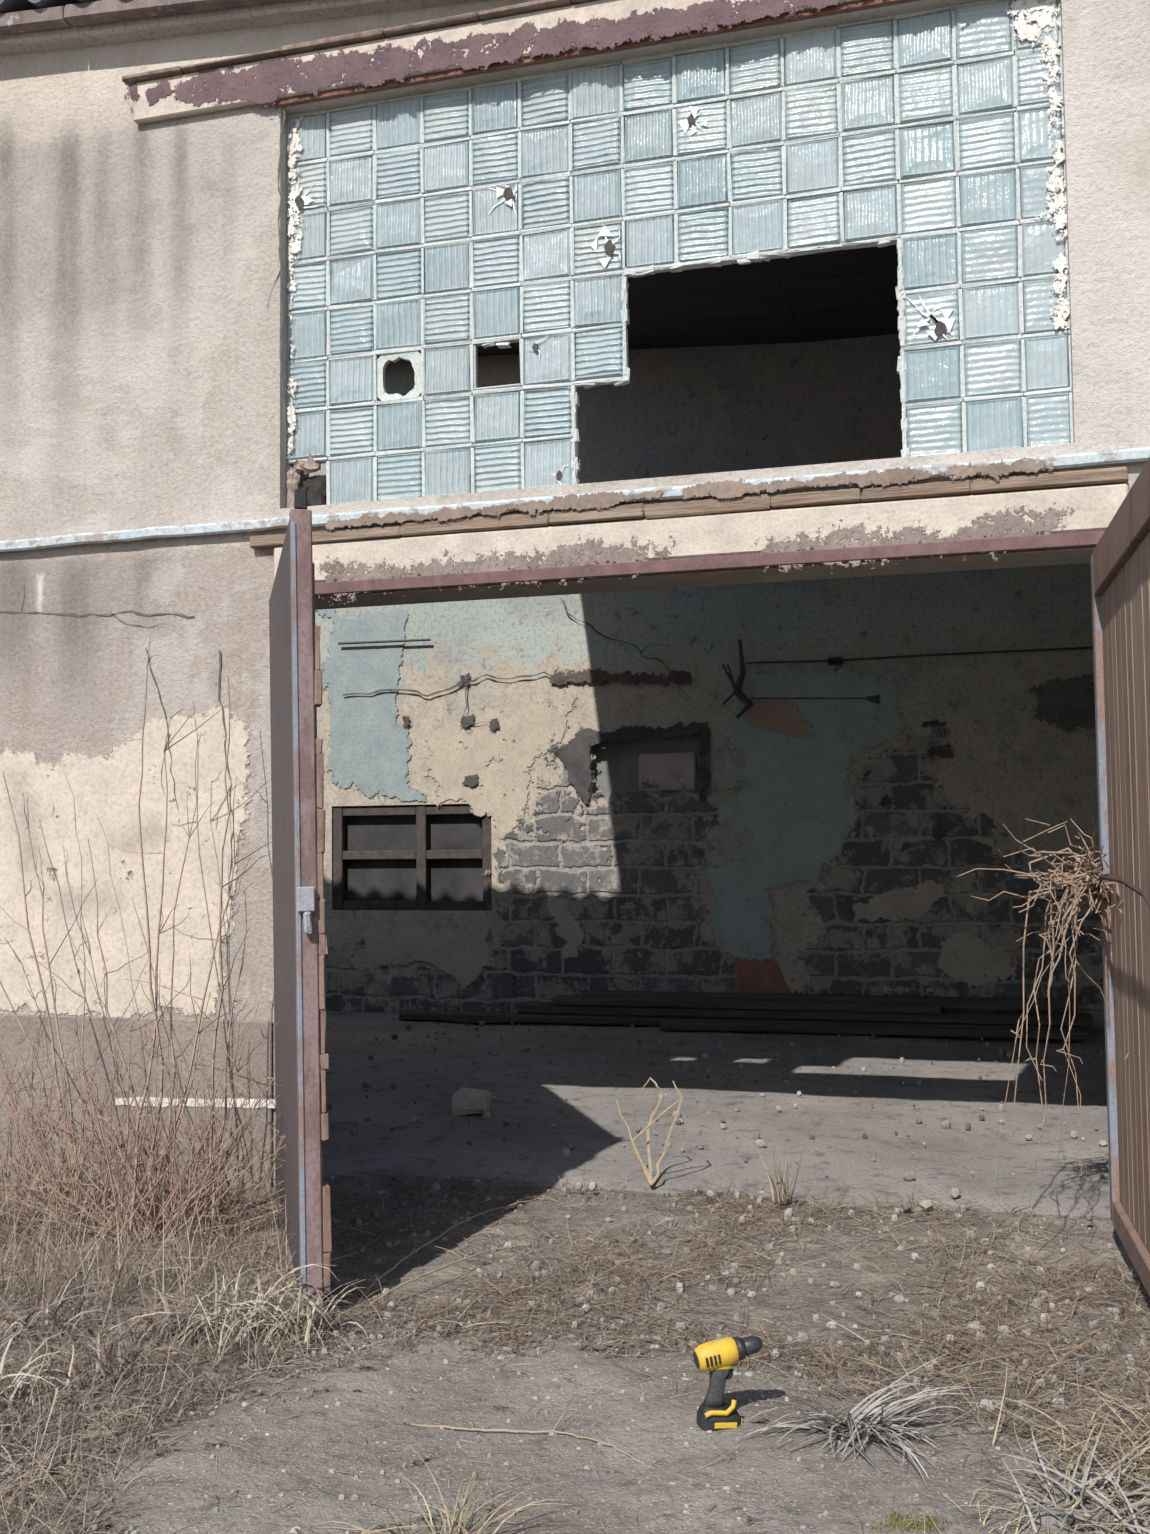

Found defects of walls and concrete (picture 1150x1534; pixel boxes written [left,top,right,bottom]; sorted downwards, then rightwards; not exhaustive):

peeling [285,116,321,508]
peeling [122,0,853,107]
spalling [325,235,1055,530]
peeling [1005,0,1070,332]
spalling [754,500,1074,574]
crack [0,596,194,811]
peeling [0,703,252,1019]
crack [216,651,233,959]
spalling [316,532,1105,1031]